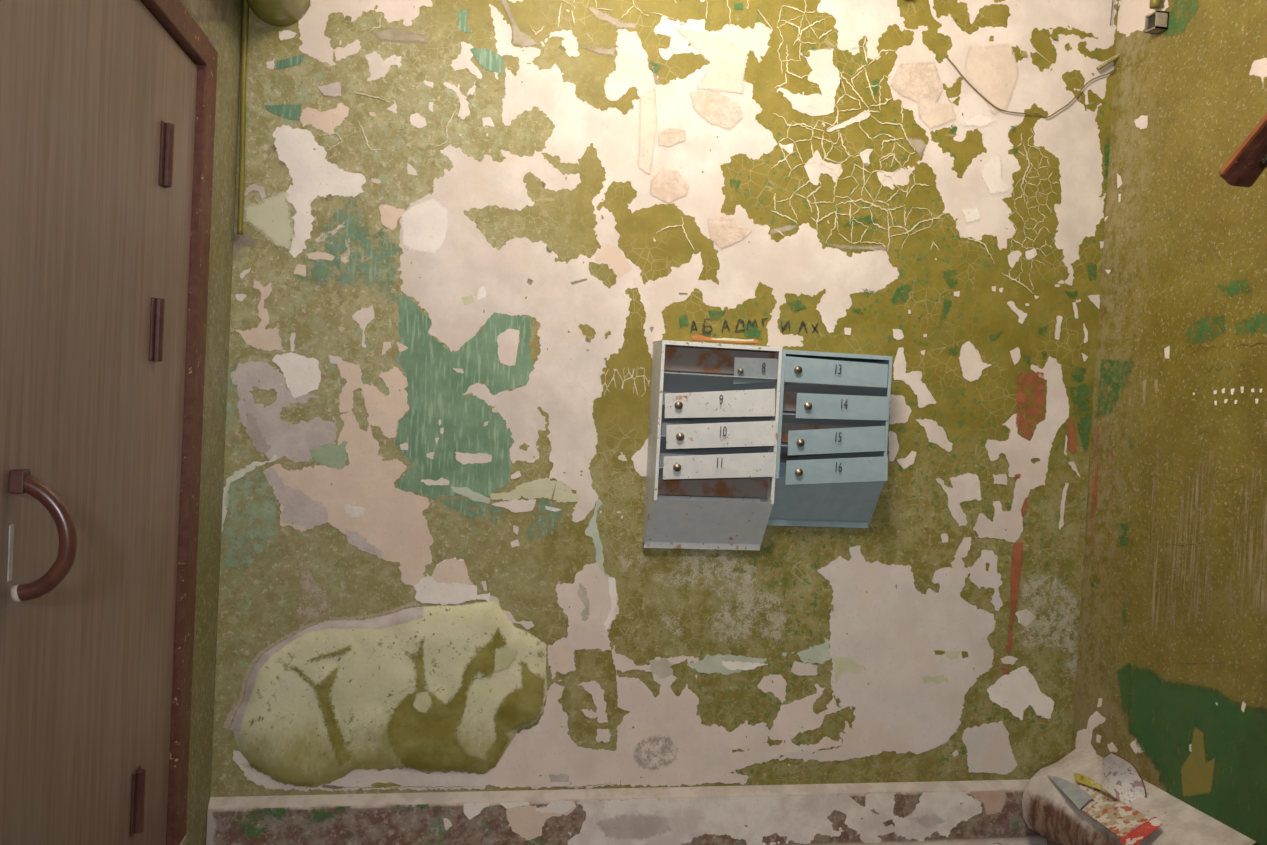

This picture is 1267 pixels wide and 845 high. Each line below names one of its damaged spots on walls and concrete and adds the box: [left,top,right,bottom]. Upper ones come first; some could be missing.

crack [530,0,676,35]
peeling [1249,57,1267,88]
crack [706,0,1059,294]
peeling [775,0,1200,287]
crack [656,217,695,250]
peeling [221,0,899,629]
peeling [992,286,1039,324]
peeling [1055,294,1100,362]
rust [1015,371,1045,441]
peeling [232,329,1081,845]
rust [1006,542,1023,653]
peeling [1075,698,1144,754]